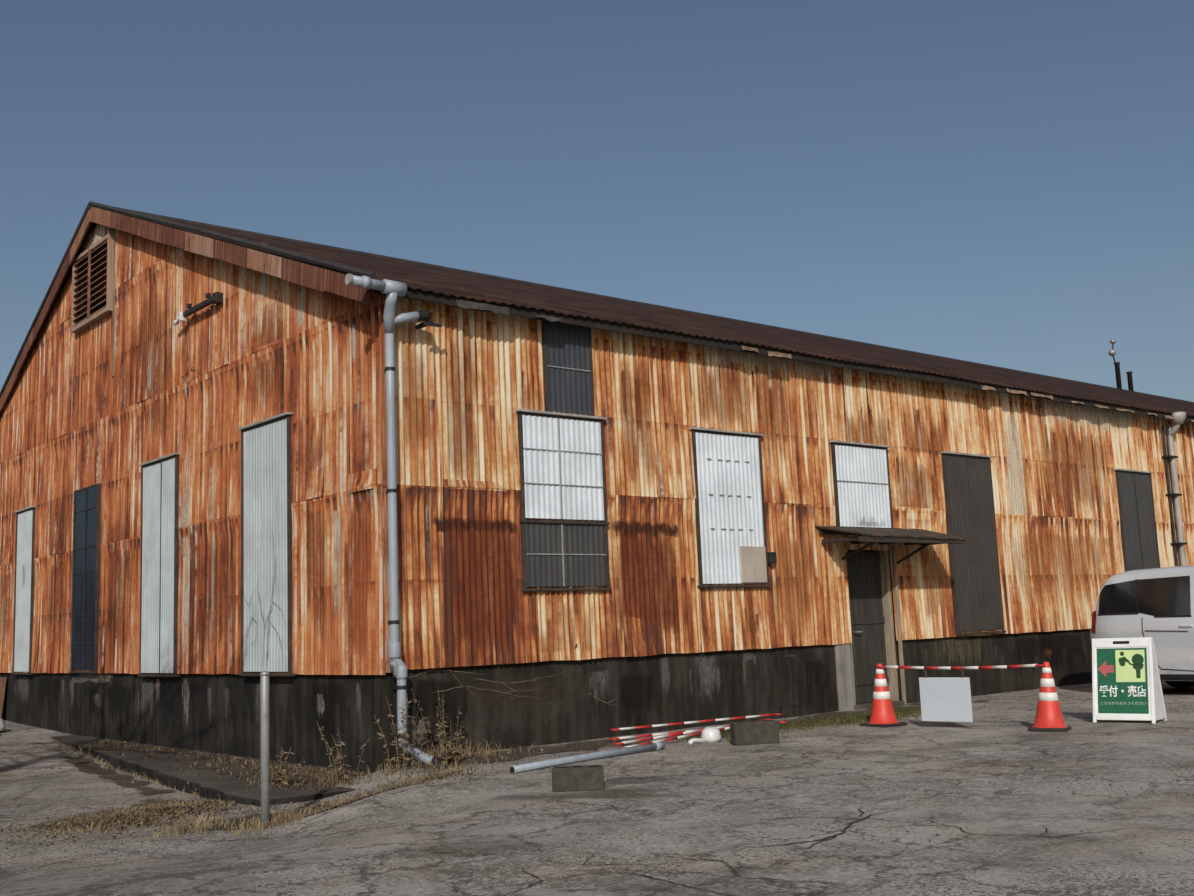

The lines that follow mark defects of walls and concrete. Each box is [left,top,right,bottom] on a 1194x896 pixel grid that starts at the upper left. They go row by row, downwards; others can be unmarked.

corrosion [451,339,477,461]
corrosion [621,371,651,425]
corrosion [752,371,786,445]
corrosion [896,457,935,509]
corrosion [1044,425,1105,496]
corrosion [348,512,367,646]
corrosion [612,521,679,632]
water stain [15,677,74,707]
water stain [95,678,160,733]
water stain [313,684,361,737]